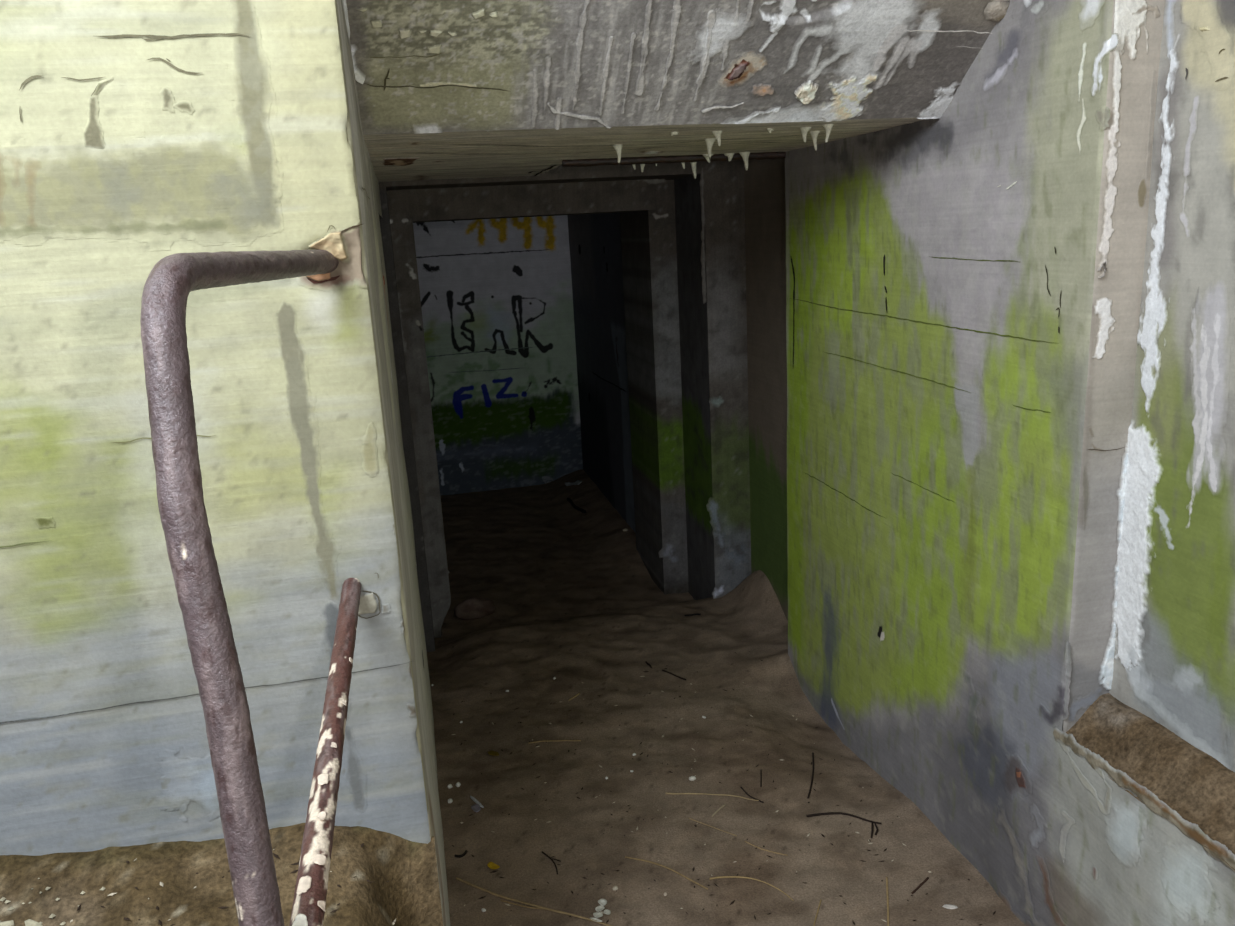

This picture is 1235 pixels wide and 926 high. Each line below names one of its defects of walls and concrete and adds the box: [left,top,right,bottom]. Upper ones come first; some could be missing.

crack [96,33,250,74]
water stain [531,0,614,129]
rust [716,45,769,89]
water stain [980,0,1057,93]
water stain [0,0,284,251]
water stain [654,0,1031,625]
water stain [1076,0,1235,771]
water stain [273,299,342,668]
crack [0,694,199,724]
crack [245,661,412,688]
water stain [343,697,368,813]
water stain [1036,641,1072,728]